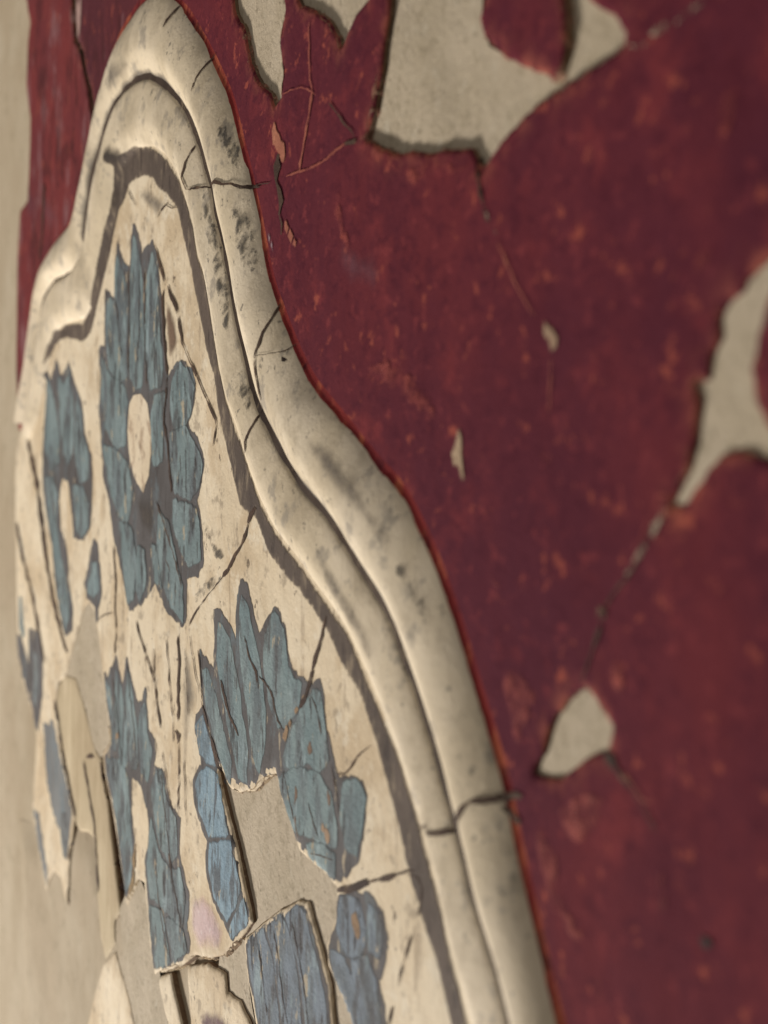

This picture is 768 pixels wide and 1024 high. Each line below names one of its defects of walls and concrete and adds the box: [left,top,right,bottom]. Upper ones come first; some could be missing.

crack [124,24,356,235]
flaking render [238,0,286,103]
flaking render [361,0,626,165]
crack [115,245,216,584]
flaking render [674,265,768,506]
crack [16,440,67,662]
crack [54,507,256,954]
crack [244,617,326,733]
flaking render [533,688,614,781]
flaking render [20,819,188,1024]
flaking render [219,774,338,1024]
crack [337,870,422,1024]